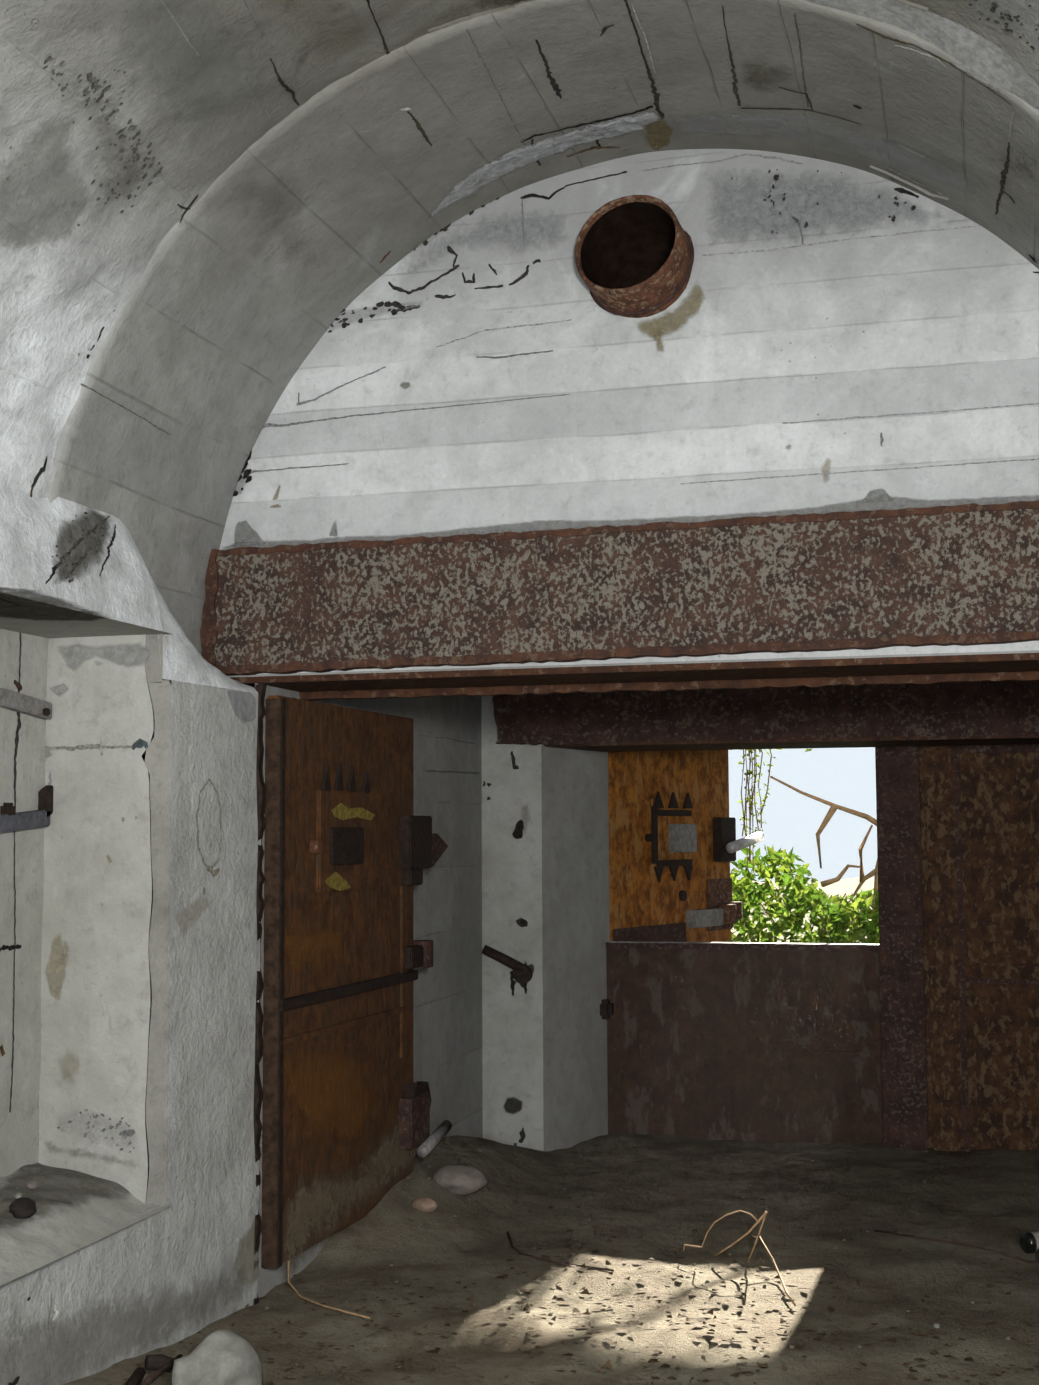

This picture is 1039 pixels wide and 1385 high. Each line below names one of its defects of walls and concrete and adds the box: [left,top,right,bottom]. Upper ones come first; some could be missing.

crack [366,0,390,55]
crack [722,6,861,125]
spalling [414,113,659,251]
crack [380,0,802,312]
crack [437,319,572,359]
rust [639,286,702,350]
spalling [52,511,111,583]